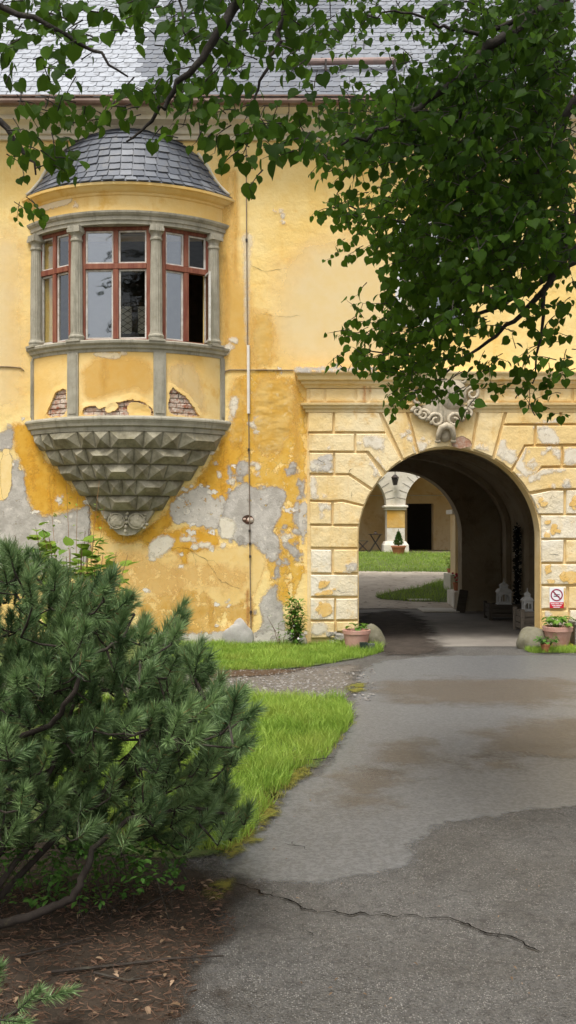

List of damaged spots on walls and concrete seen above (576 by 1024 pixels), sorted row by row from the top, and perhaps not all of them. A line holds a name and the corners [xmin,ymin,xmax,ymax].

flaking render [48,390,67,417]
flaking render [83,400,153,415]
flaking render [168,388,198,417]
flaking render [0,425,91,574]
peeling [452,419,576,510]
flaking render [148,447,336,644]